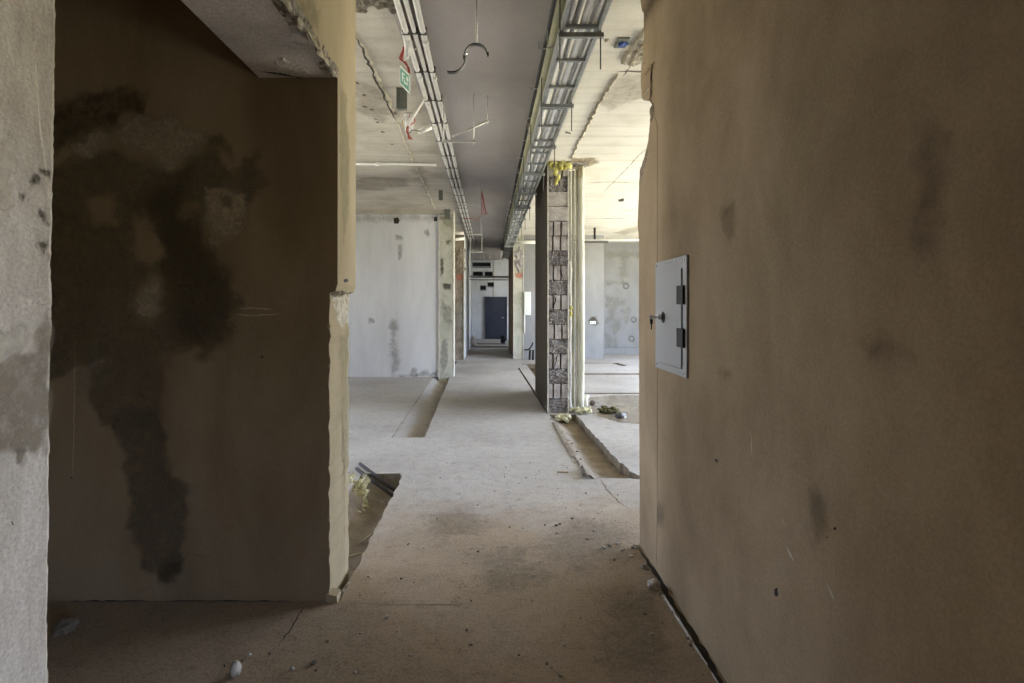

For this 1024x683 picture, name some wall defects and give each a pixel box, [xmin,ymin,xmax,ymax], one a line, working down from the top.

spalling [271,0,339,78]
leakage [53,87,144,148]
crack [356,38,397,122]
spalling [330,291,349,329]
leakage [0,137,265,582]